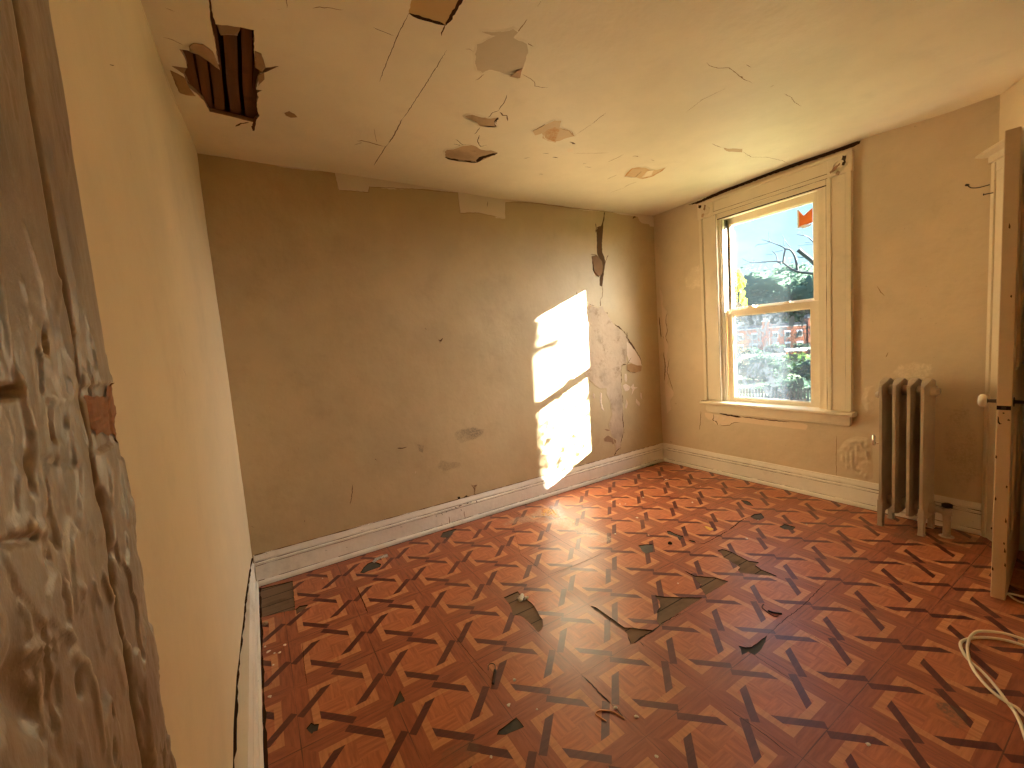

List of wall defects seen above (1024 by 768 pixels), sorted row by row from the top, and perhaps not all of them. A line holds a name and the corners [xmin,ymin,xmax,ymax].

spalling [172,4,278,122]
crack [375,13,409,82]
crack [358,26,472,163]
peeling [409,0,463,26]
peeling [443,144,500,163]
peeling [462,113,499,128]
peeling [472,26,531,78]
crack [576,156,654,455]
flaking render [578,300,642,453]